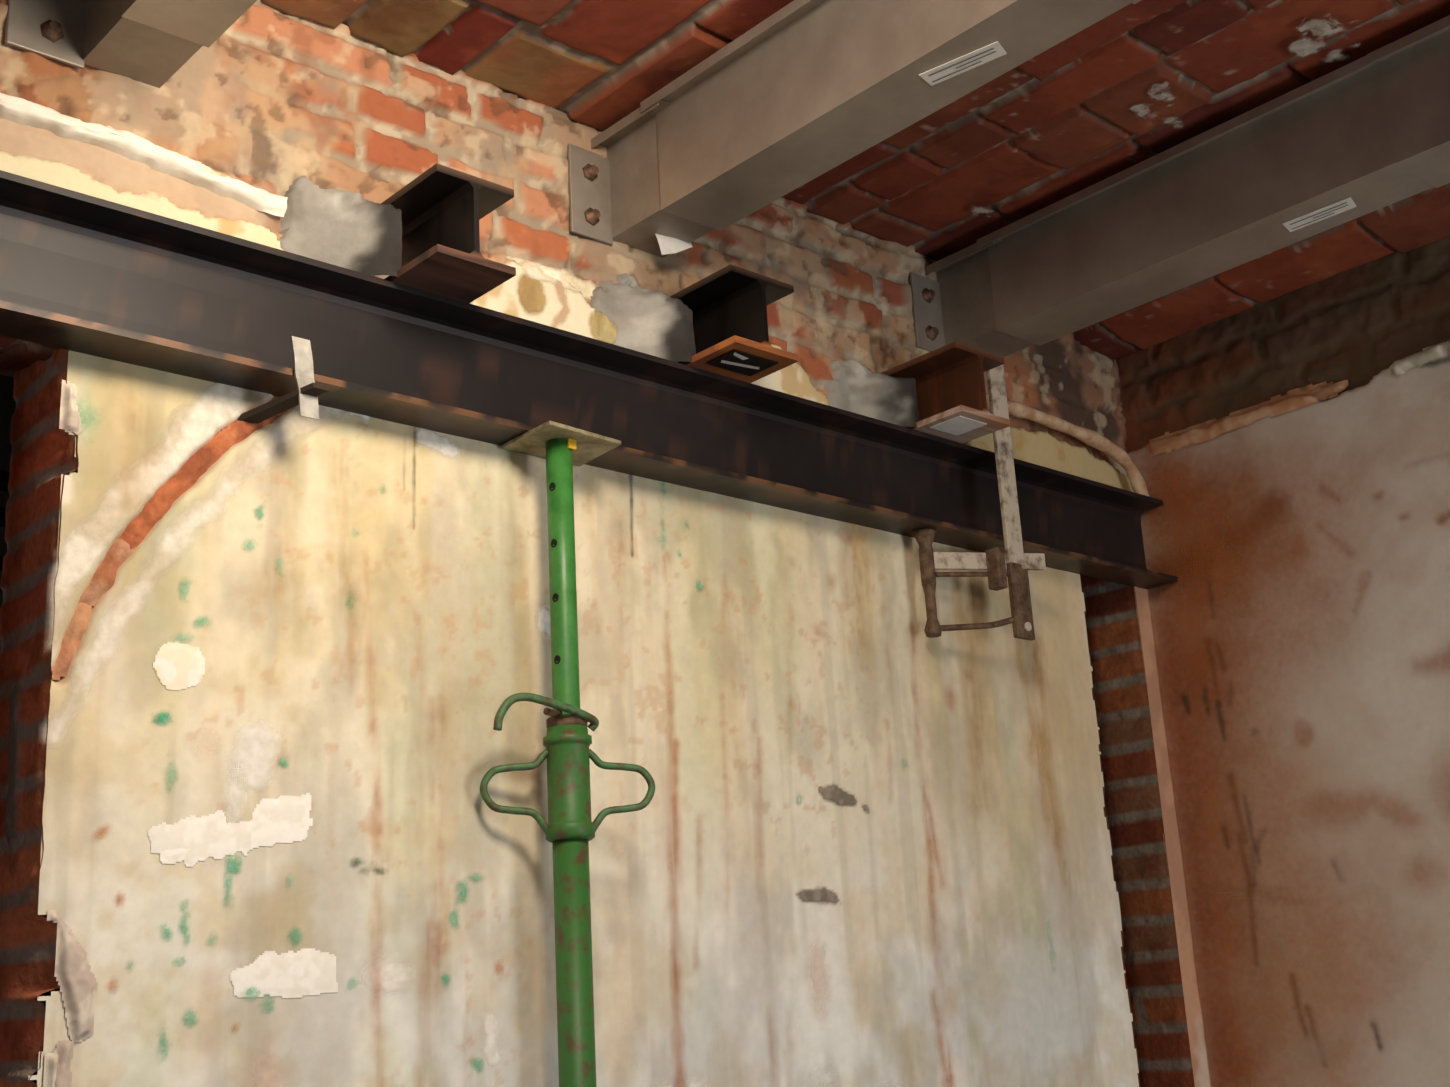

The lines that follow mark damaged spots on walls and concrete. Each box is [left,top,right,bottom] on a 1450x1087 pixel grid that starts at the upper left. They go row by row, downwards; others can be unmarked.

peeling [1390,340,1450,379]
peeling [1145,380,1349,456]
flaking render [48,380,370,743]
peeling [147,721,313,867]
flaking render [819,785,869,813]
flaking render [798,888,839,903]
peeling [230,948,338,998]